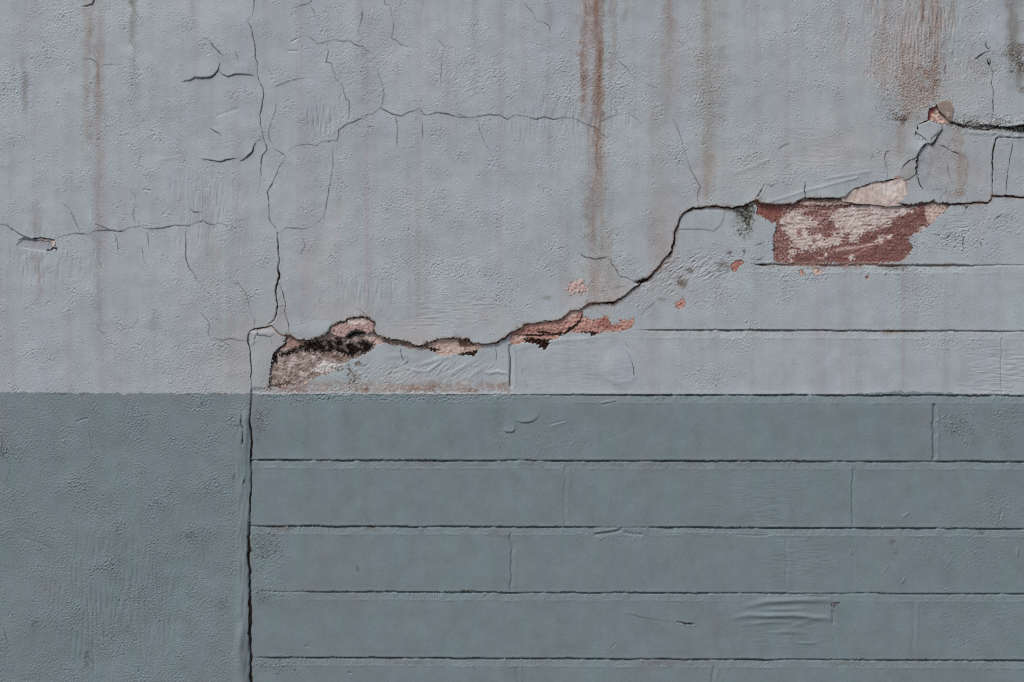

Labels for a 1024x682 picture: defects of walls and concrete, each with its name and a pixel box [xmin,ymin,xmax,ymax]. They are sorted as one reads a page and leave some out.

spalling [756,101,1024,279]
crack [899,38,1024,246]
spalling [268,316,488,389]
crack [56,0,849,682]
spalling [510,309,635,350]